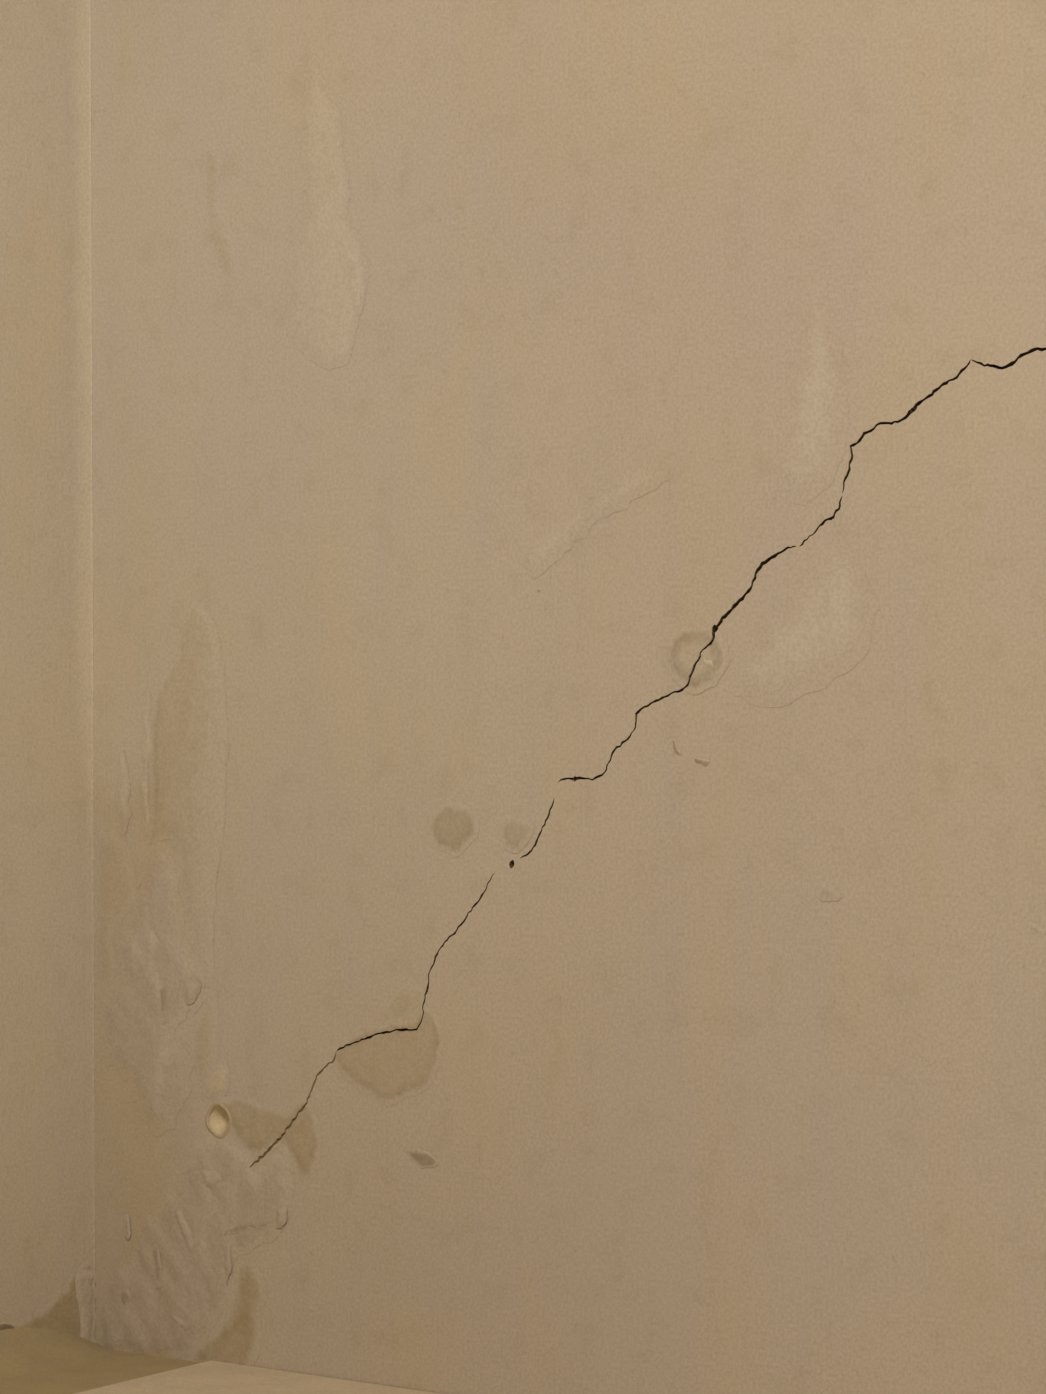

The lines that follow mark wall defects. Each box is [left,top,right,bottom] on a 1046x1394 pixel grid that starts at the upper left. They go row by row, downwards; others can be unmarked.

crack [251,347,1046,1167]
damp [426,800,480,858]
damp [330,977,445,1107]
damp [205,1093,322,1184]
damp [188,1257,267,1366]